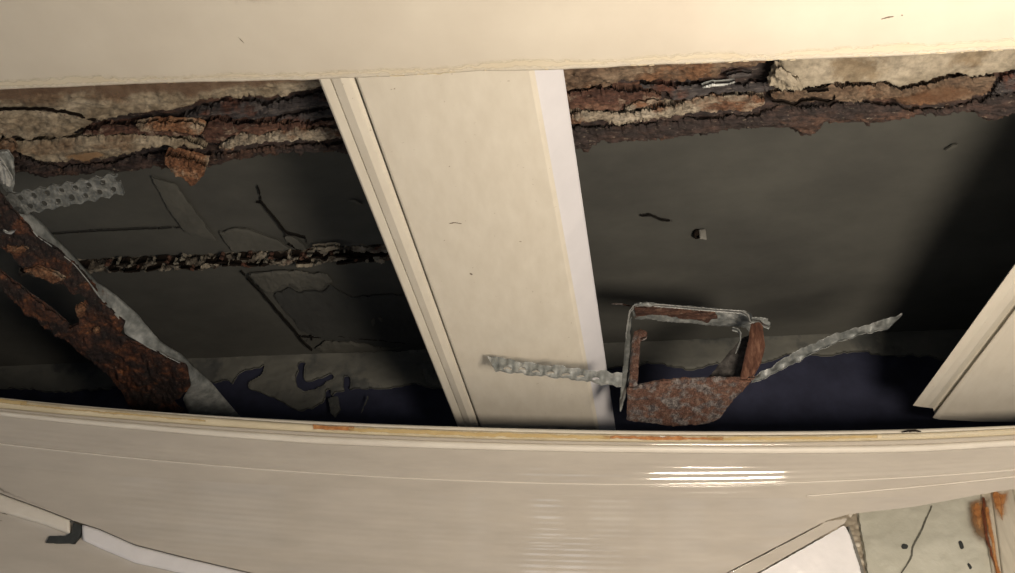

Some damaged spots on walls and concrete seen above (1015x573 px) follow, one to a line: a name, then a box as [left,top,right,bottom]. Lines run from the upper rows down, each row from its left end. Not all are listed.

corrosion [0,79,348,186]
spalling [0,72,352,163]
peeling [628,54,751,66]
corrosion [563,61,1015,148]
spalling [764,40,1015,106]
crack [256,186,308,252]
peeling [109,249,443,418]
crack [241,270,405,351]
corrosion [634,306,718,323]
peeling [0,363,116,393]
corrosion [971,492,1007,573]